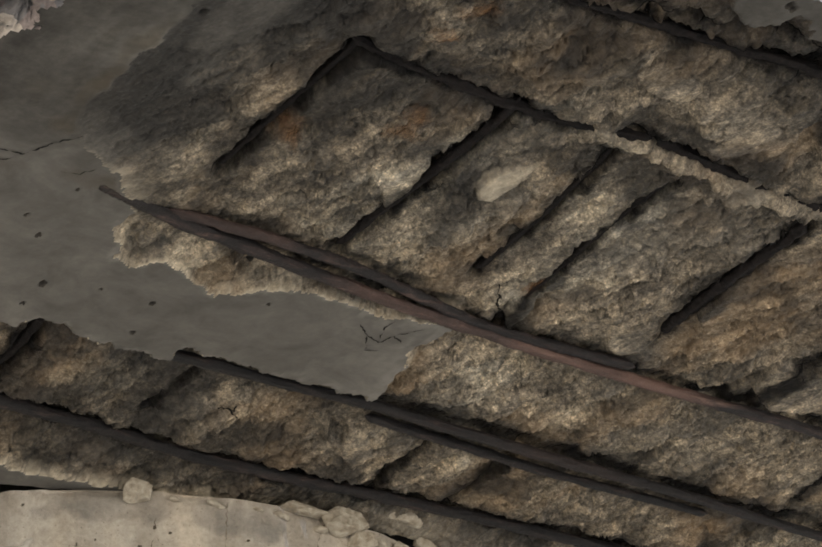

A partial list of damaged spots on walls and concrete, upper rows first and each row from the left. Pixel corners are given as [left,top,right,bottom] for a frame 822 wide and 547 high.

spalling [0,0,65,38]
spalling [79,0,822,427]
corrosion [560,204,647,276]
corrosion [753,219,815,255]
corrosion [474,278,545,329]
spalling [0,185,822,547]
corrosion [682,352,822,405]
corrosion [470,418,649,479]
corrosion [254,447,455,506]
corrosion [660,476,794,519]
corrosion [792,476,822,501]
corrosion [576,529,635,547]